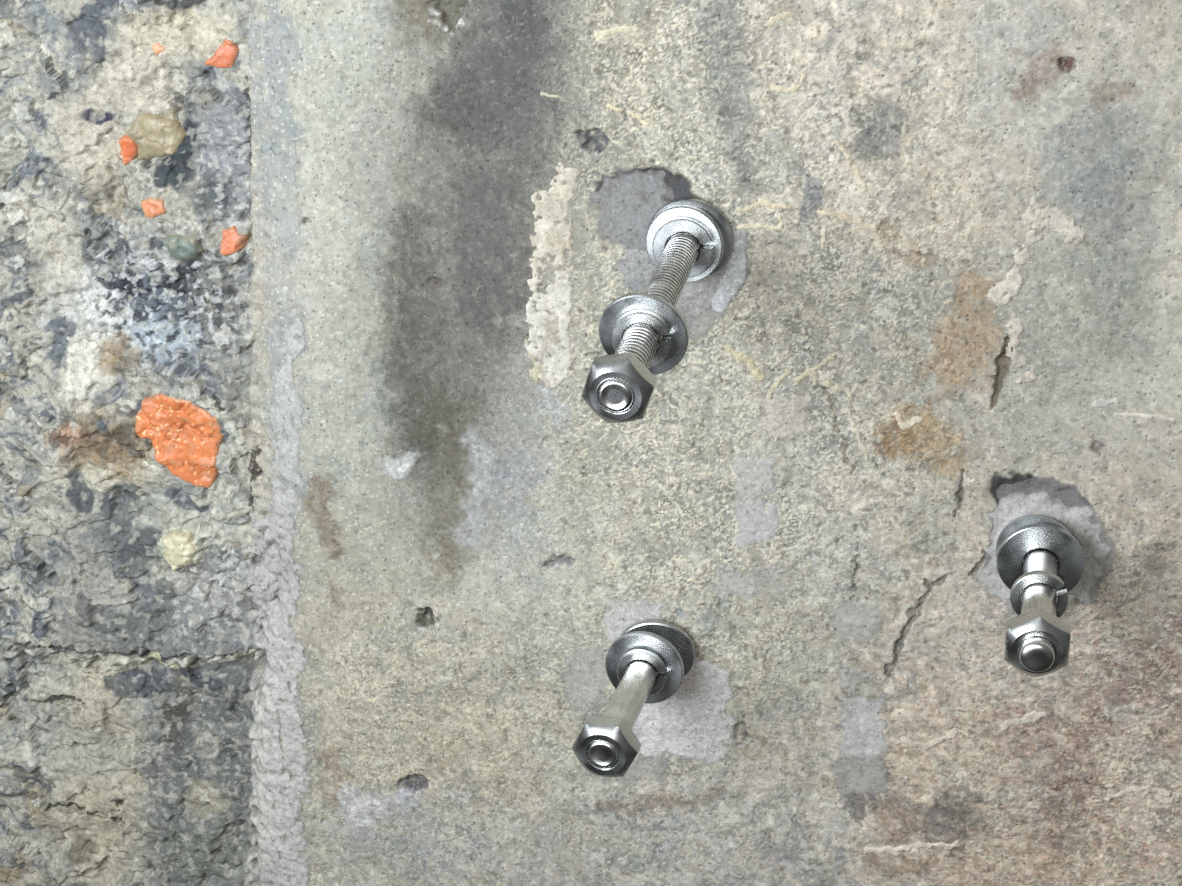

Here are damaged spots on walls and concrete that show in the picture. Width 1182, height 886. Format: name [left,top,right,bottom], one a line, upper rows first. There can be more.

water stain [384,33,541,570]
crack [954,468,964,517]
crack [884,549,986,677]